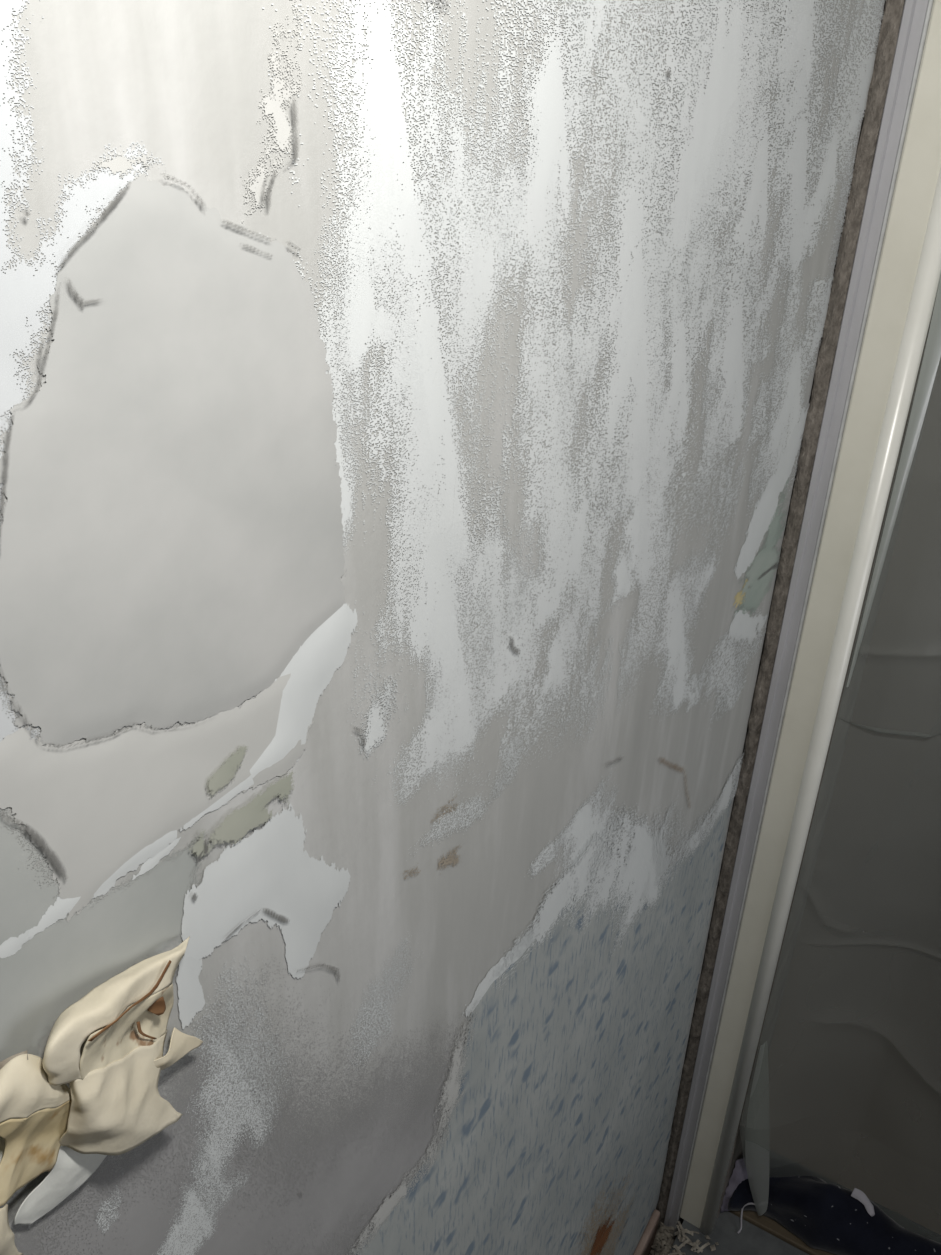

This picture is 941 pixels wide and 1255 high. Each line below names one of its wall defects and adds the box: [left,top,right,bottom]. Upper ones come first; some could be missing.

crack [0,188,127,521]
crack [167,176,300,250]
crack [263,102,298,205]
flaking render [0,770,351,1255]